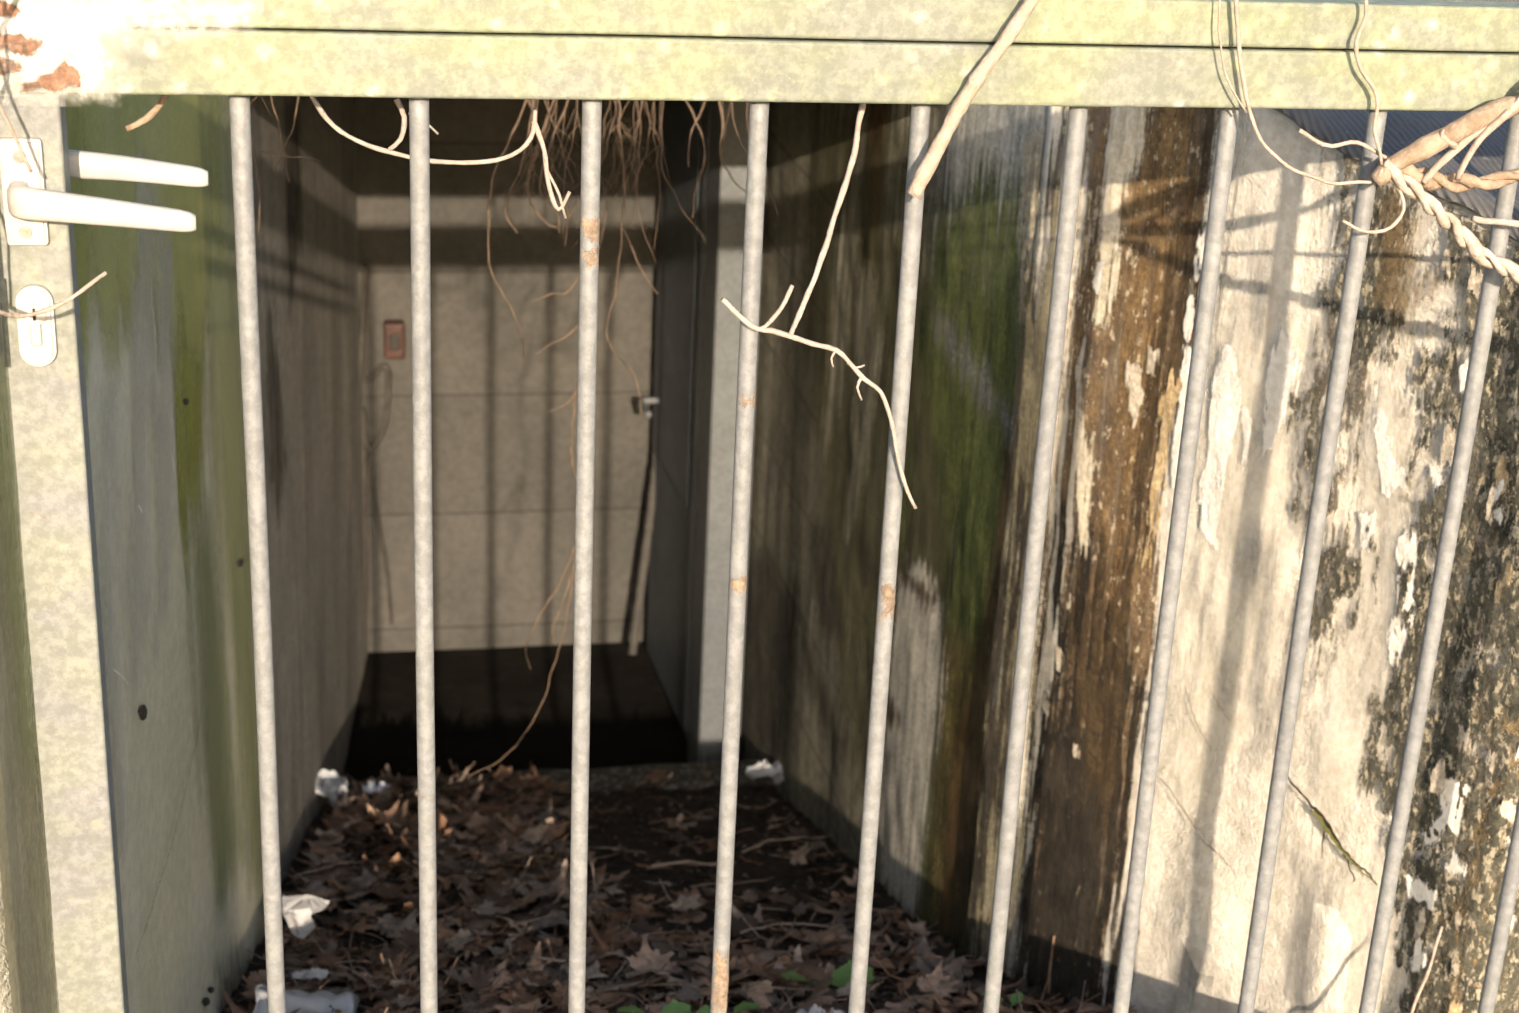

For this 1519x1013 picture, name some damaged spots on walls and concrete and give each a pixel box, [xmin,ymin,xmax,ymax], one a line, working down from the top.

water stain [82,94,235,894]
water stain [740,104,1252,1013]
crack [1288,776,1378,886]
water stain [1286,154,1519,1013]